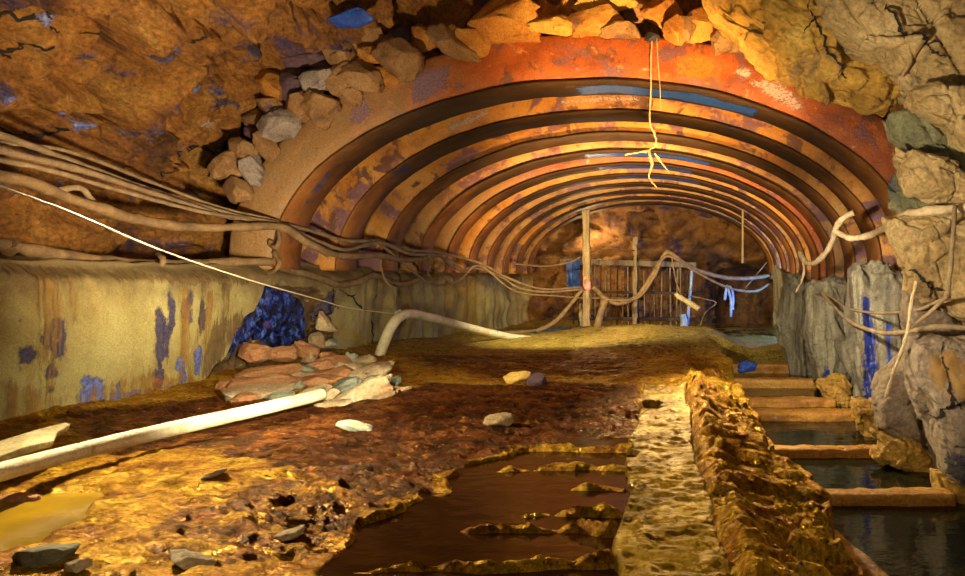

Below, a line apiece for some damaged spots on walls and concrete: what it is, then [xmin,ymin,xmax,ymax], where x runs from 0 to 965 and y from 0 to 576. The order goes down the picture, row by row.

corrosion [338,172,358,191]
crack [307,289,377,343]